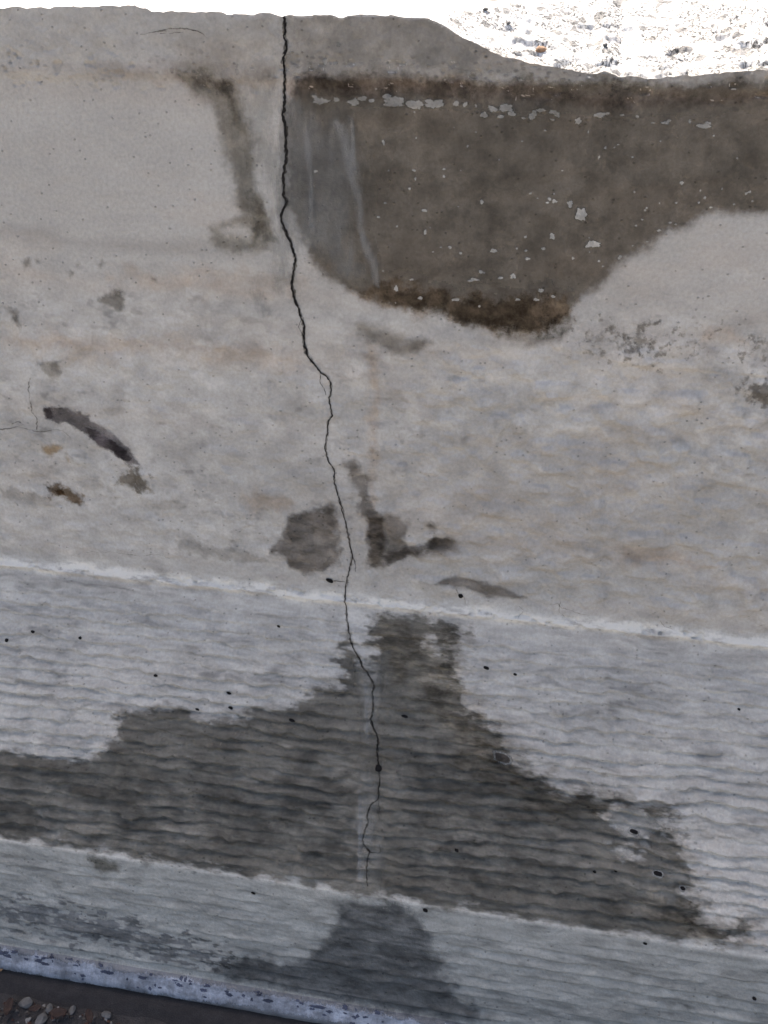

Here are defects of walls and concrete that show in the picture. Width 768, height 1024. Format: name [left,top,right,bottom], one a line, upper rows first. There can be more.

leakage [286,77,768,330]
leakage [287,515,316,568]
crack [280,16,381,886]
leakage [337,659,360,686]